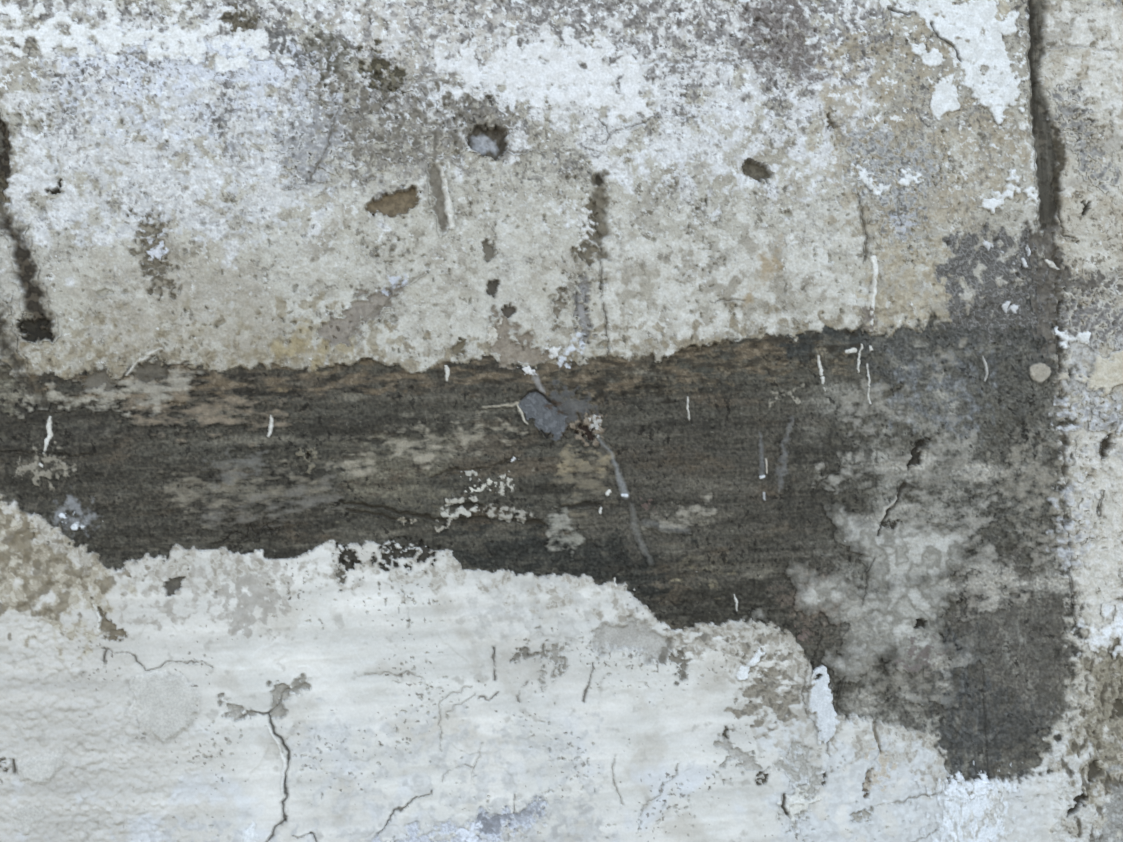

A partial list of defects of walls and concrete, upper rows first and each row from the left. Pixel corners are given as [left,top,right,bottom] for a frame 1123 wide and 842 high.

crack [0,111,130,412]
peeling [0,164,1123,835]
crack [100,646,214,672]
crack [254,710,318,842]
crack [357,646,530,834]